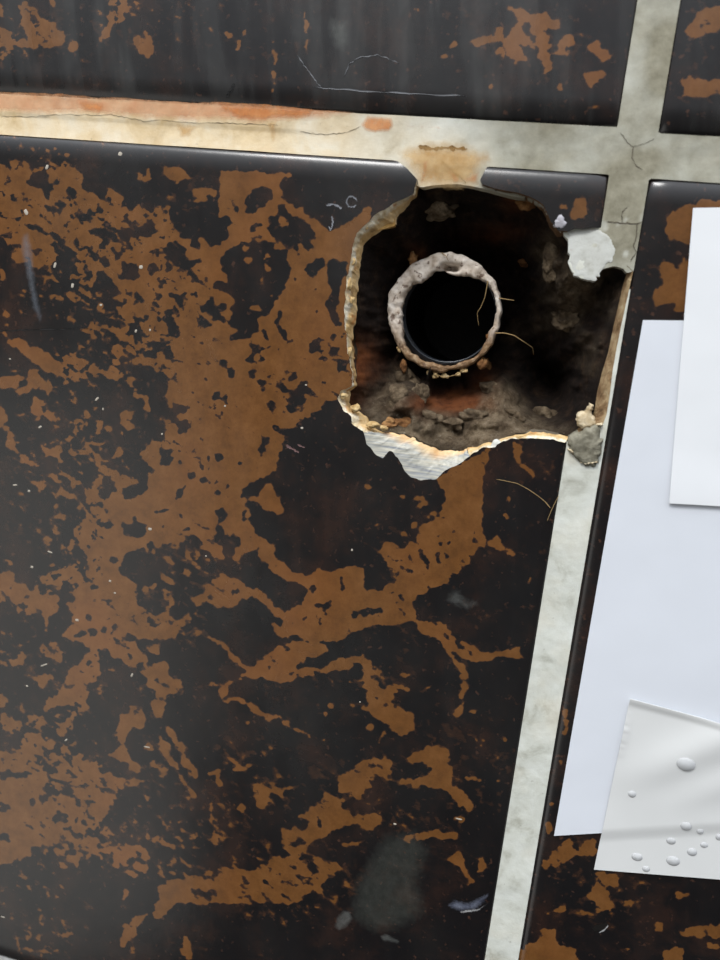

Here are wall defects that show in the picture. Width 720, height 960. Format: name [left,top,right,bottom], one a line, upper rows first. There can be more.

corrosion [0,94,335,127]
corrosion [409,151,475,180]
spalling [338,182,633,480]